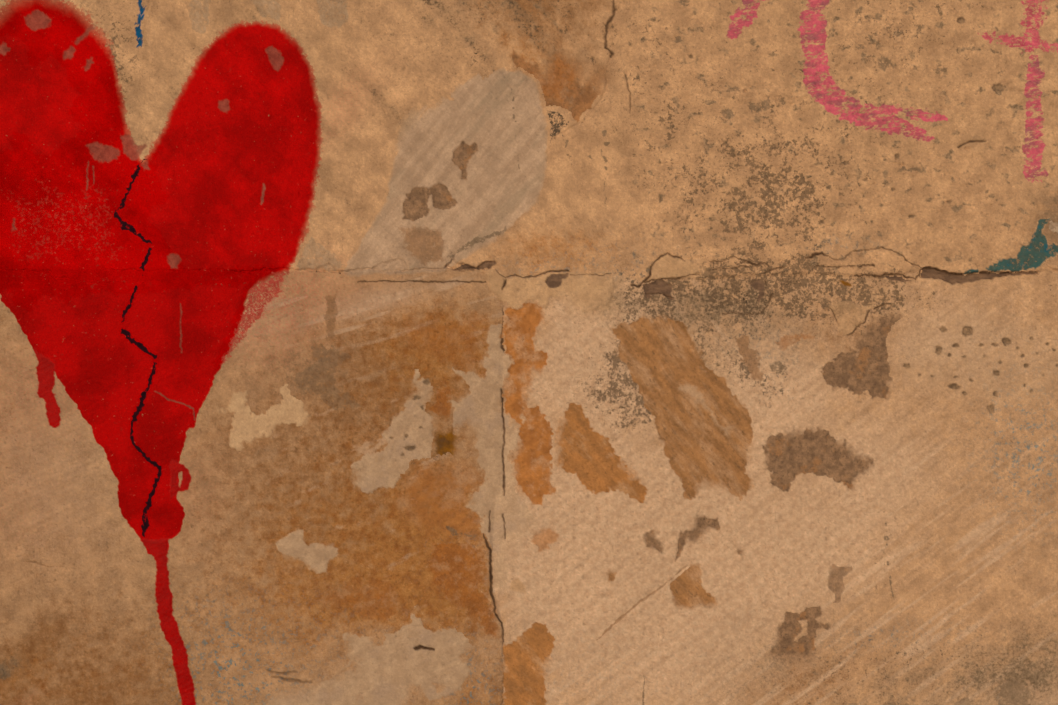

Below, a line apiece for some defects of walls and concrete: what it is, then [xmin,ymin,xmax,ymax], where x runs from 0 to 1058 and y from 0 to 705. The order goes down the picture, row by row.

crack [602,0,632,114]
spalling [388,425,424,458]
crack [298,268,612,355]
spalling [452,260,497,272]
peeling [545,272,570,290]
peeling [500,300,648,510]
peeling [605,252,879,613]
peeling [820,299,906,407]
crack [482,388,507,705]
spalling [265,668,314,685]
peeling [499,619,556,705]
peeling [765,564,854,669]